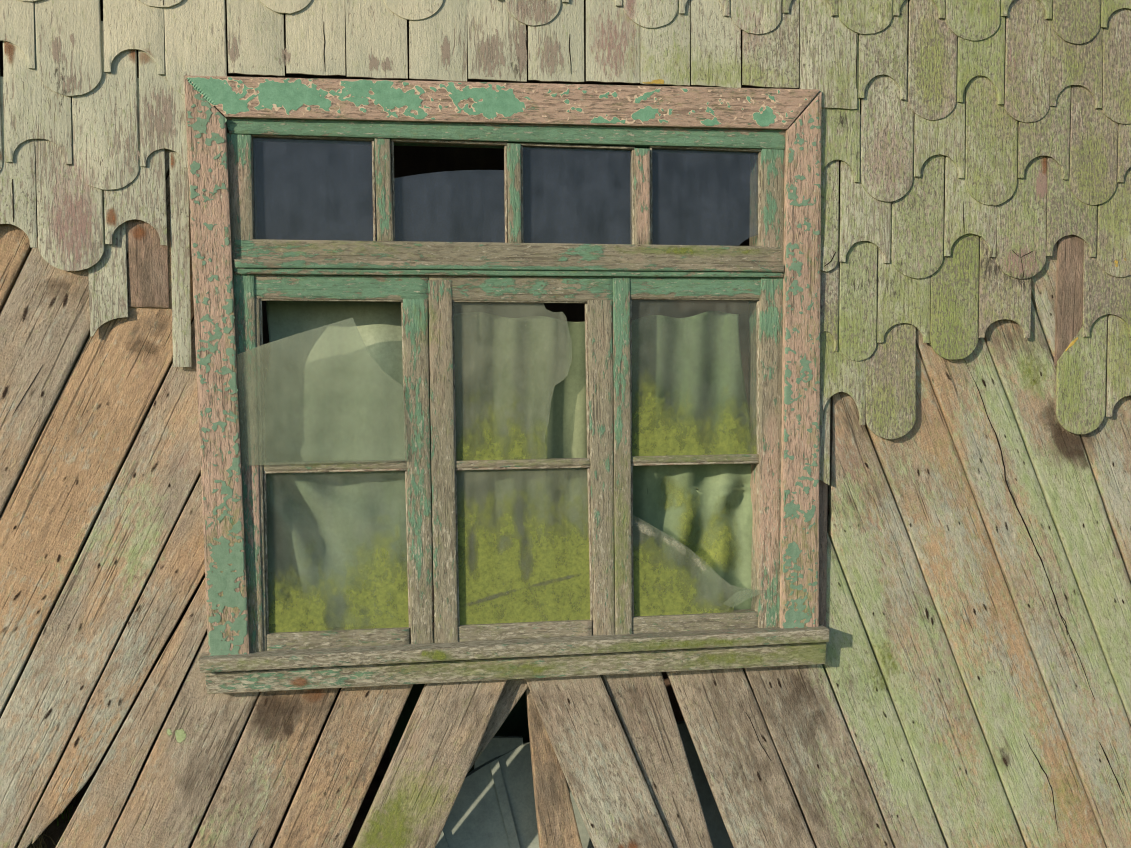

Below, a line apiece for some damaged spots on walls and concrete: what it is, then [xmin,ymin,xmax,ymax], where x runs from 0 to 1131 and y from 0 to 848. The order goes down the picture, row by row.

peeling [145,0,673,205]
peeling [688,89,821,318]
peeling [193,243,247,656]
peeling [782,327,820,628]
crack [965,361,1095,699]
crack [1024,735,1058,831]